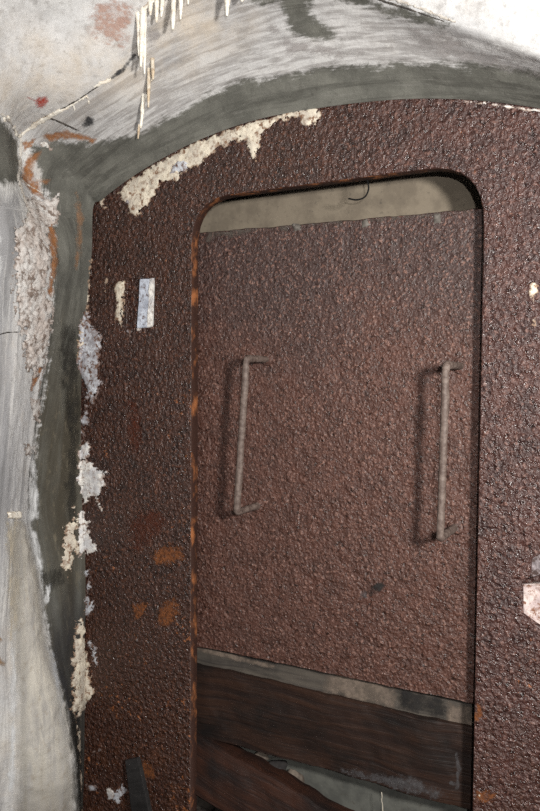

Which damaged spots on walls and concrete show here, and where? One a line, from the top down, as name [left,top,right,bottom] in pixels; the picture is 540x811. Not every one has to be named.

efflorescence [135,0,189,139]
water stain [27,457,38,521]
water stain [30,258,108,622]
water stain [47,569,100,805]